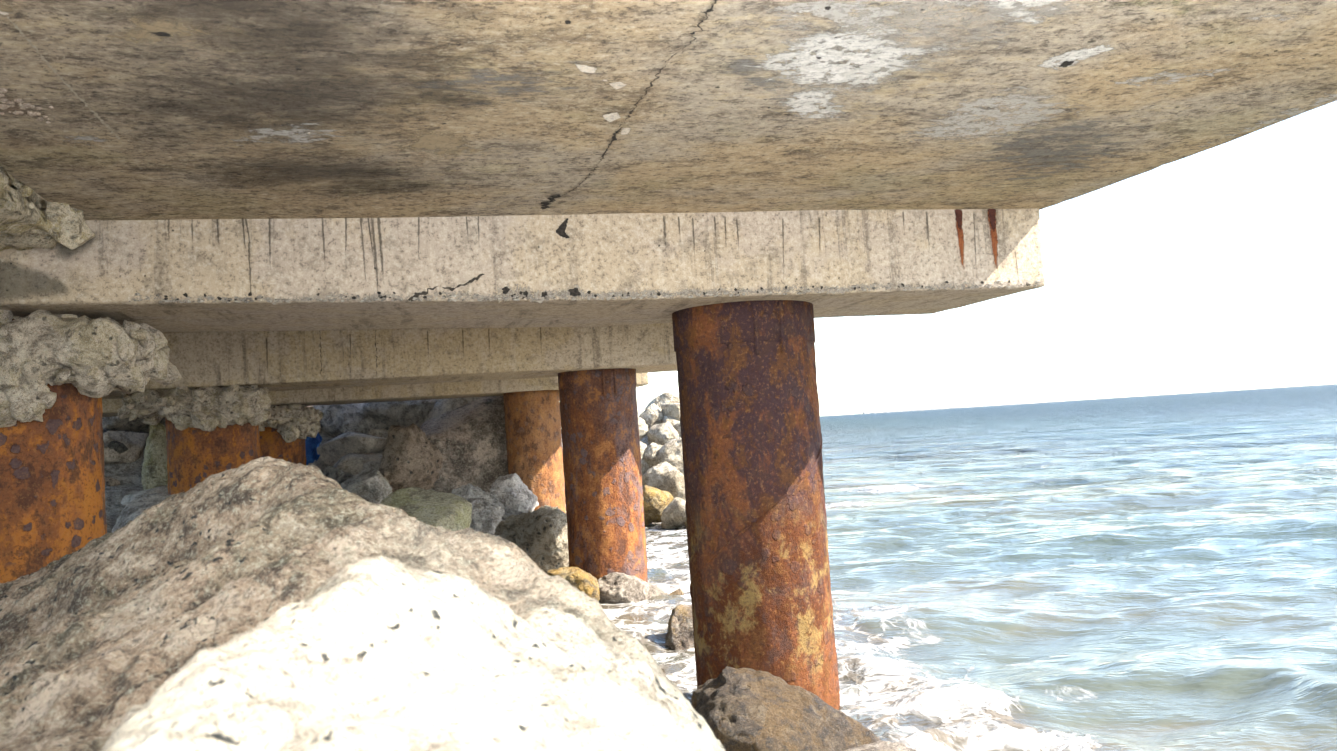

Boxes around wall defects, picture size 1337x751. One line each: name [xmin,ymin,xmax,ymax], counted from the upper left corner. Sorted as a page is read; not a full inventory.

water stain [940,0,1070,24]
water stain [148,0,381,143]
water stain [410,63,577,106]
crack [561,0,717,196]
water stain [728,0,948,119]
water stain [230,163,422,193]
corrosion [955,209,965,269]
corrosion [987,209,998,269]